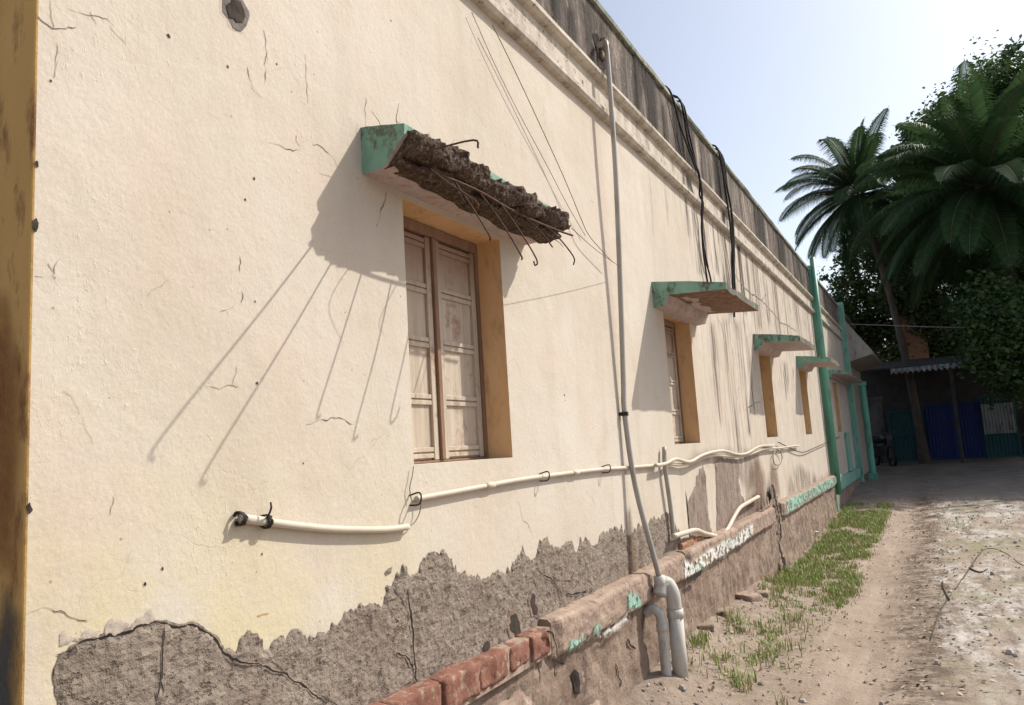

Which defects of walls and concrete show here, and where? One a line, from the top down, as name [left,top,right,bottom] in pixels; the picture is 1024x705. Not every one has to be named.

flaking render [219,0,251,34]
spalling [385,130,575,266]
crack [762,479,788,570]
flaking render [53,457,763,705]
crack [27,607,338,705]
crack [387,587,421,683]